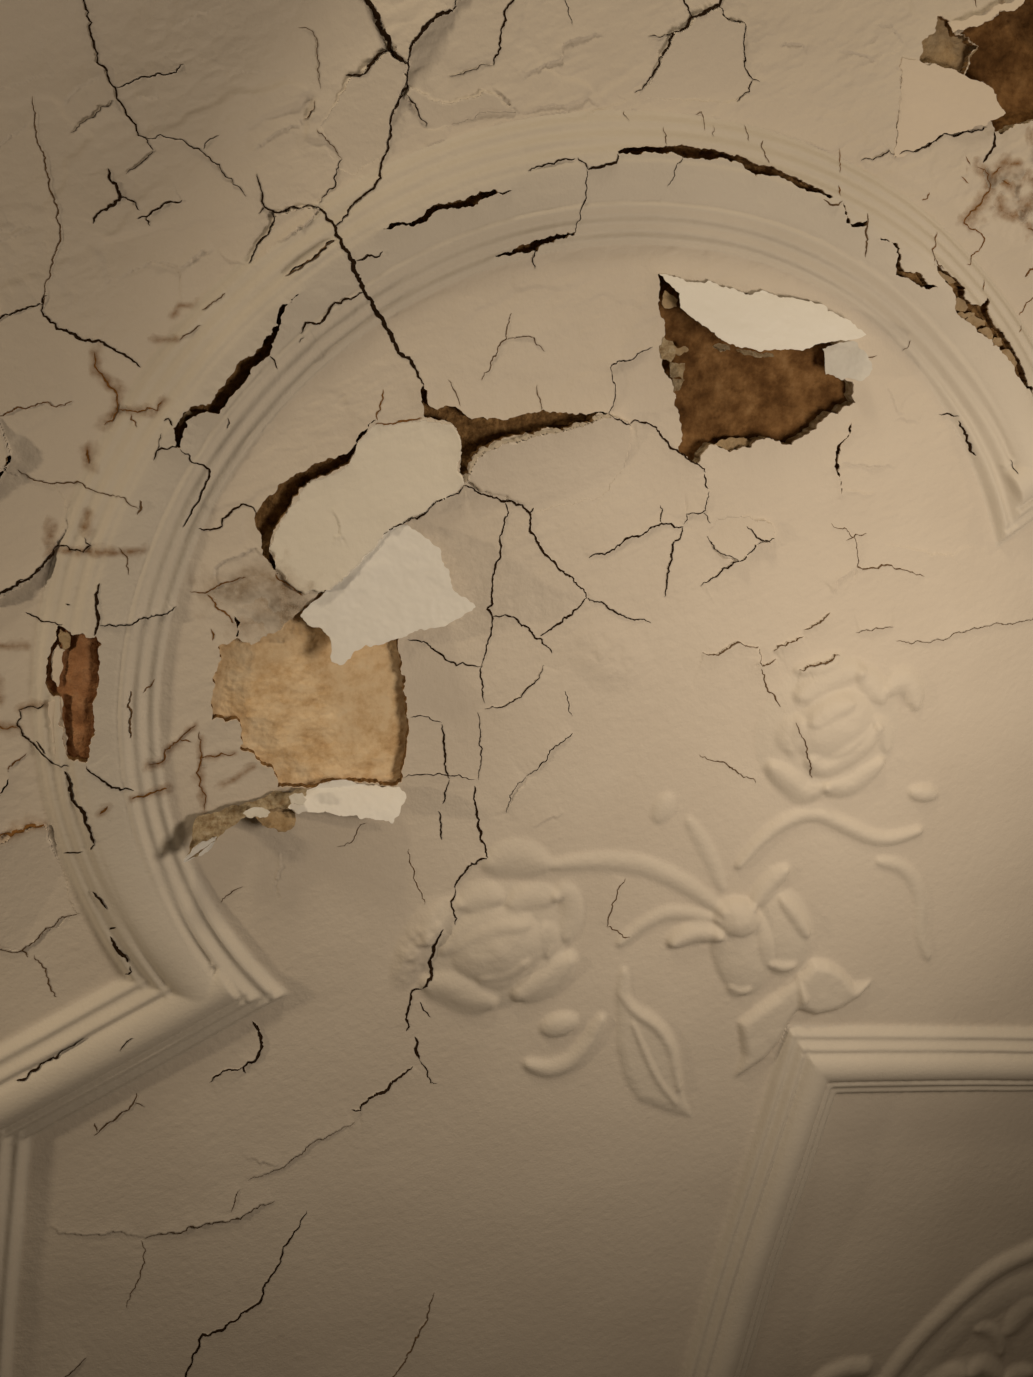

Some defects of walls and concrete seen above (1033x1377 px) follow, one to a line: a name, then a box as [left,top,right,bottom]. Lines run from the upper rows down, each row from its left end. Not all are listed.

spalling [894,0,1033,157]
crack [496,0,1033,395]
spalling [658,274,873,463]
crack [831,423,923,576]
crack [939,413,976,456]
spalling [45,625,102,763]
spalling [183,524,475,863]
crack [0,0,774,1302]
crack [706,613,1033,777]
crack [185,1212,307,1377]